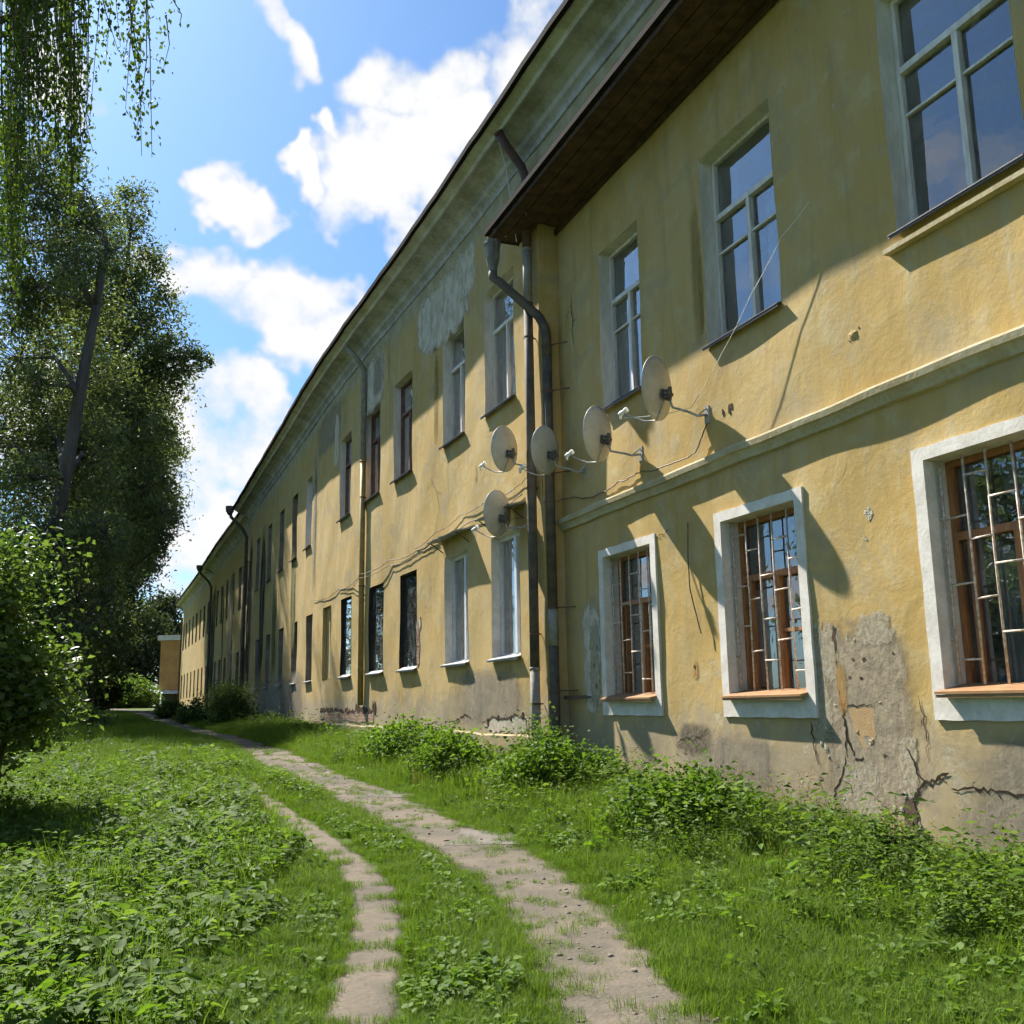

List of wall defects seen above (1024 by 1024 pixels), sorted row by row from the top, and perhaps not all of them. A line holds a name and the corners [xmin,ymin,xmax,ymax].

spalling [320,701,376,723]
spalling [481,712,529,734]
damp [676,723,768,796]
crack [834,659,864,814]
peeling [813,610,919,821]
crack [904,696,1024,803]